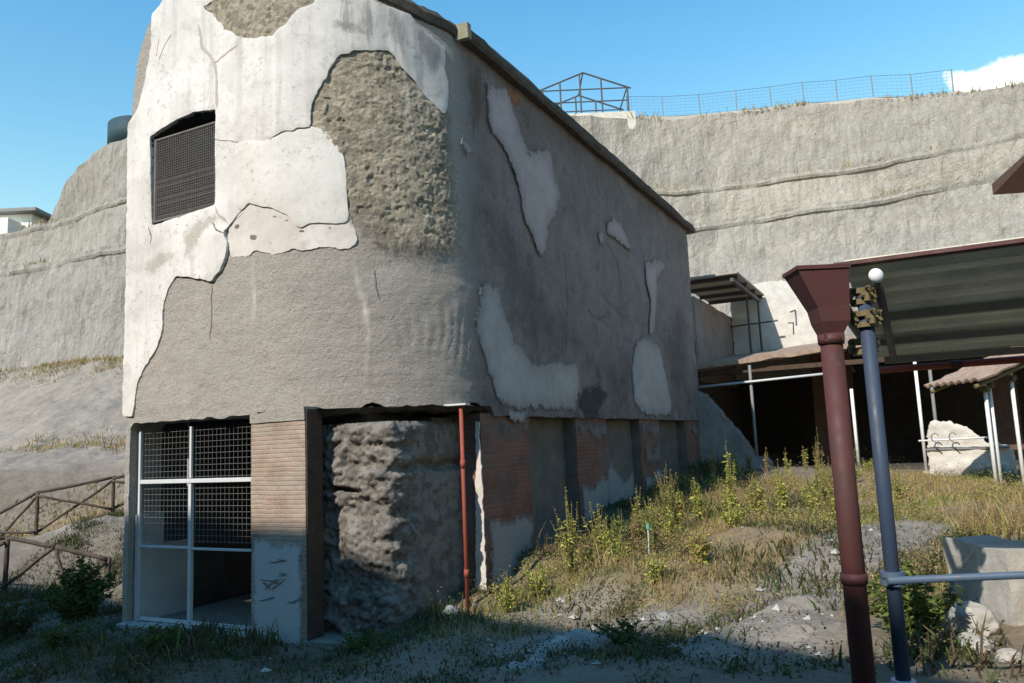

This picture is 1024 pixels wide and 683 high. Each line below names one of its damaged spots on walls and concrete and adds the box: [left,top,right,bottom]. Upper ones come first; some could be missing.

crack [198,24,237,106]
crack [212,203,250,233]
peeling [122,0,473,417]
peeling [485,82,560,257]
peeling [598,217,631,250]
peeling [475,281,580,423]
peeling [631,258,672,417]